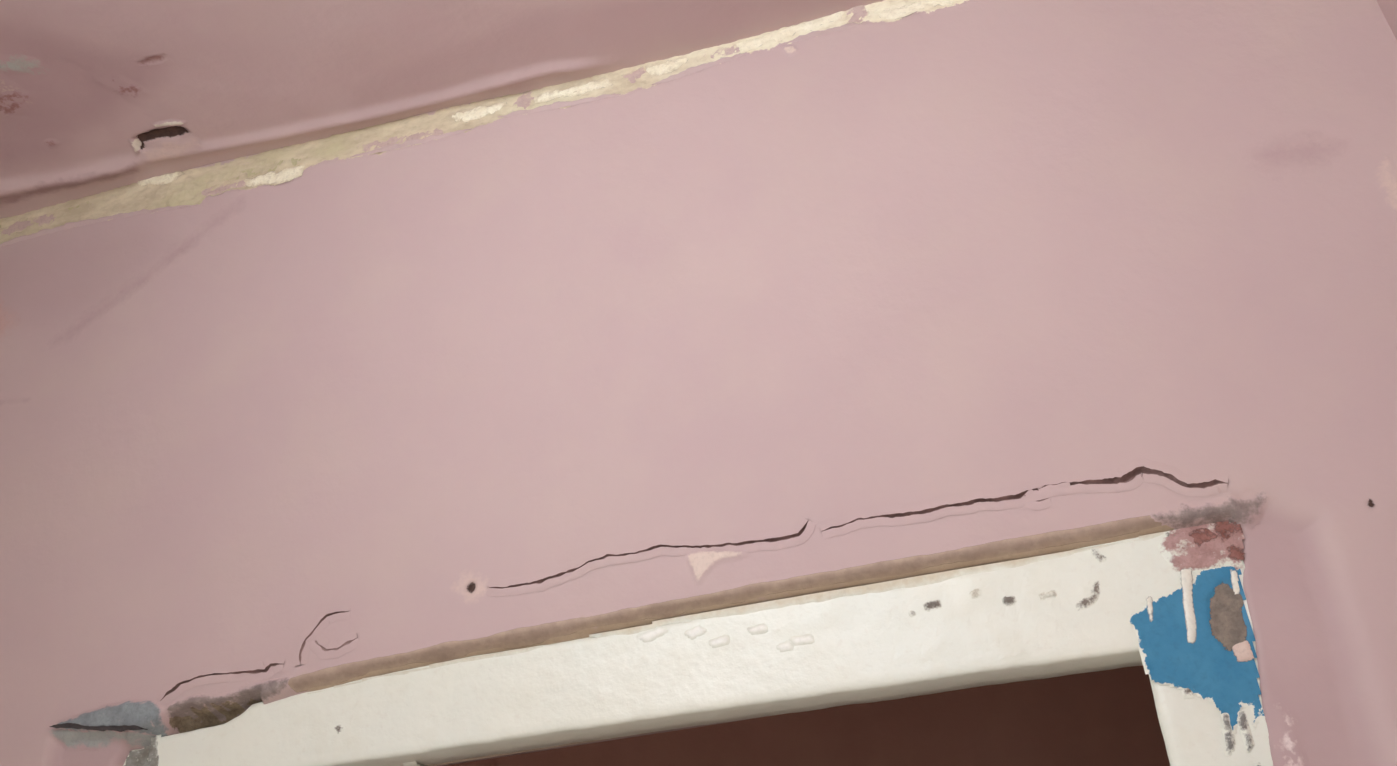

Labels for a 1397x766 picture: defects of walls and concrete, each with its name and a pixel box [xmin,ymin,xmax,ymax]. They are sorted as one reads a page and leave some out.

peeling [0,0,991,250]
crack [486,458,1228,597]
flaking render [165,675,294,734]
crack [157,603,360,706]
peeling [1129,566,1265,766]